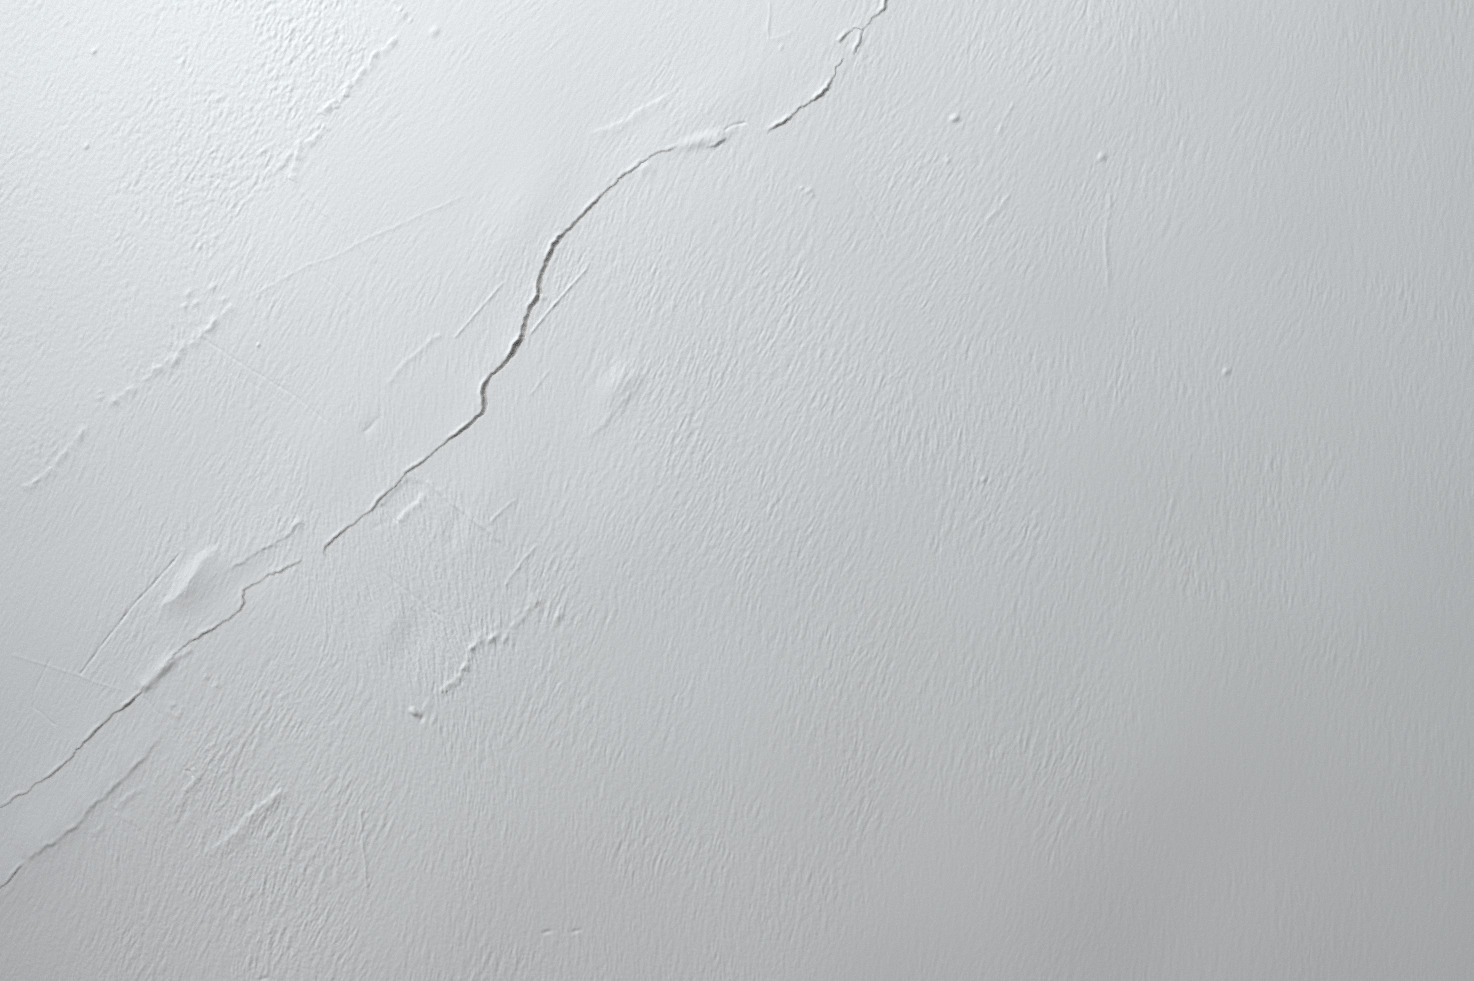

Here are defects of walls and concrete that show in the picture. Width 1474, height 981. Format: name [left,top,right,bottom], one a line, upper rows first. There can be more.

crack [0,0,899,818]